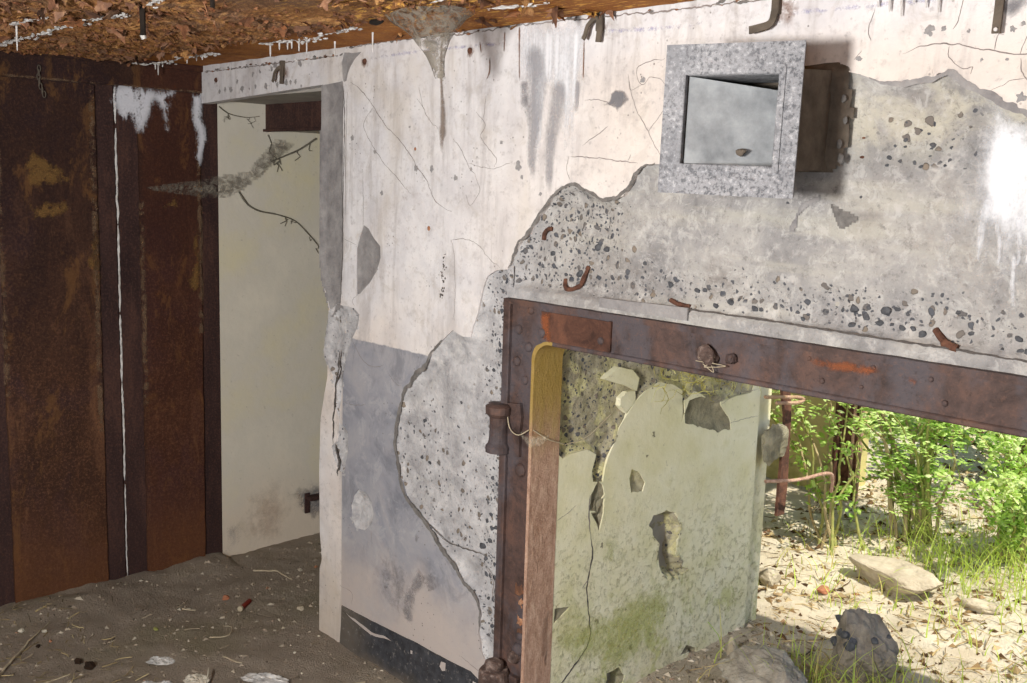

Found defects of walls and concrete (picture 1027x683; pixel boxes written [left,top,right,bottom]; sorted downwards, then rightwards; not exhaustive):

damp [193,96,206,162]
flaking render [0,0,760,477]
damp [522,29,581,179]
peeling [924,24,946,37]
crack [906,1,1027,90]
damp [979,115,1027,252]
damp [113,86,173,576]
spalling [393,56,1027,659]
rust [815,360,874,373]
crack [560,498,593,683]